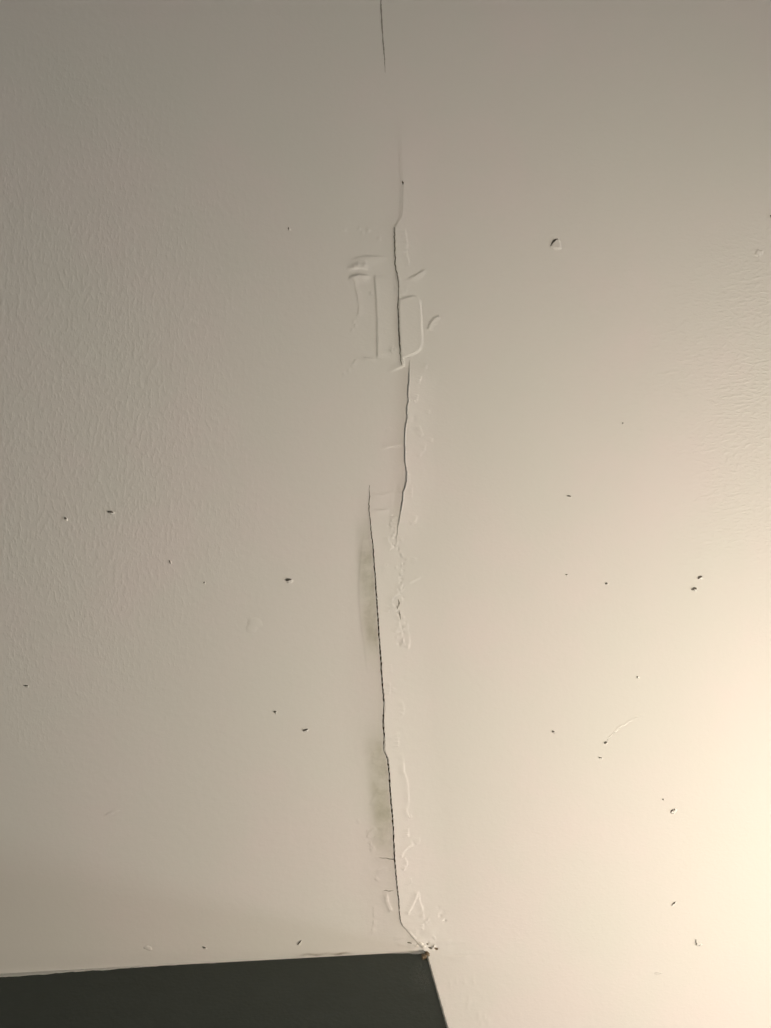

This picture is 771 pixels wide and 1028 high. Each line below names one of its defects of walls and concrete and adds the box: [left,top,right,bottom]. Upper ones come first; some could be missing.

crack [378,1,386,65]
peeling [379,359,437,512]
crack [344,485,458,952]